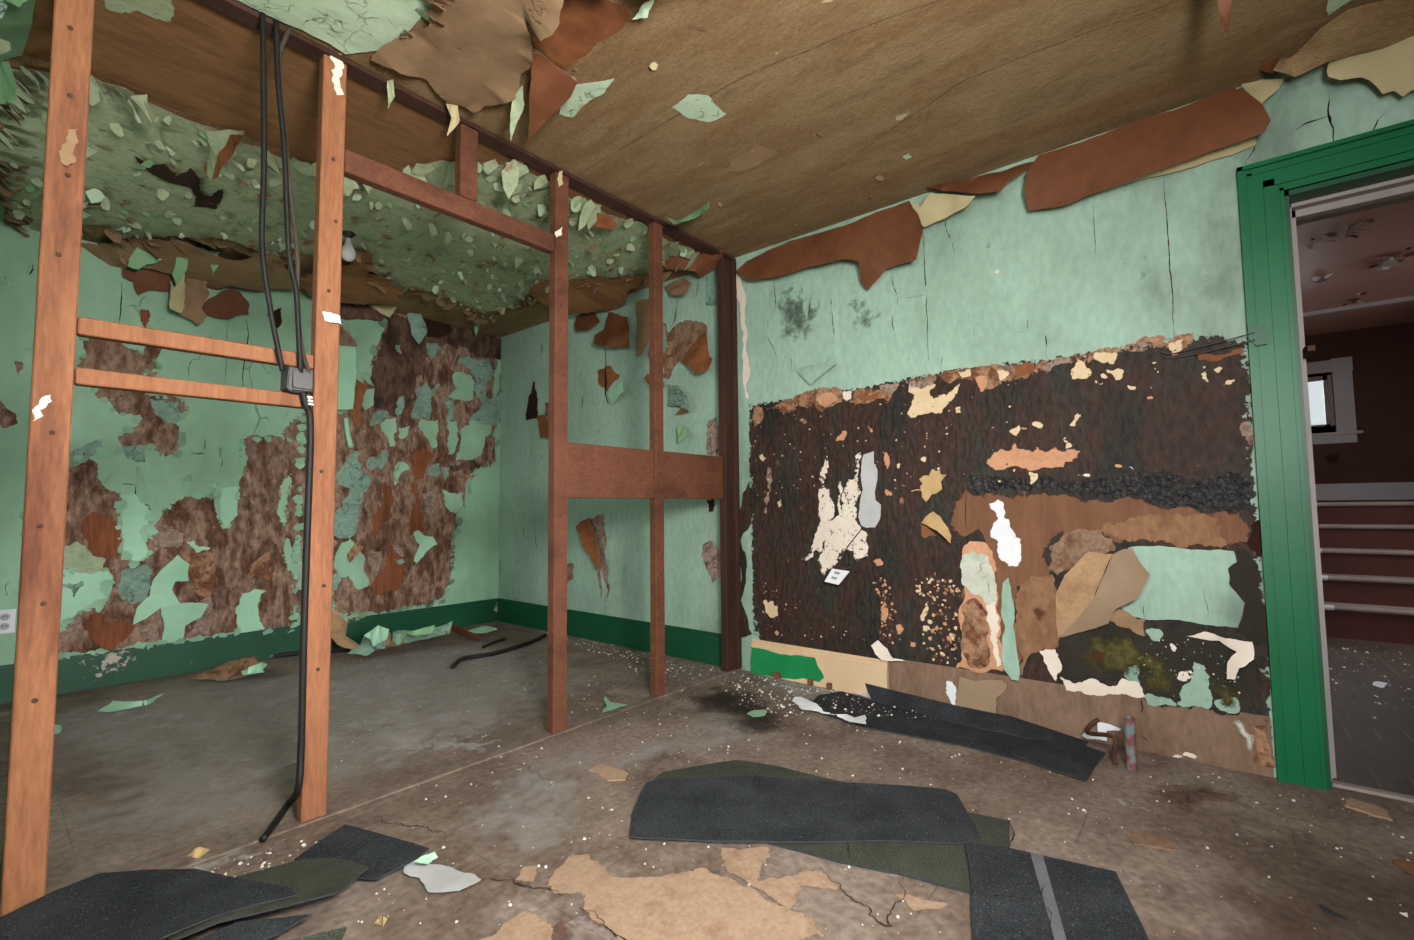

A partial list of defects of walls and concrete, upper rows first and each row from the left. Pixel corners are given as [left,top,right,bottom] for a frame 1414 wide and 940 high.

peeling [0,38,49,238]
peeling [82,75,316,328]
peeling [476,158,550,232]
peeling [568,196,717,442]
peeling [58,337,307,659]
peeling [331,177,550,649]
peeling [858,451,881,528]
peeling [921,511,951,543]
peeling [987,444,1080,471]
peeling [1055,548,1150,638]
peeling [871,640,907,662]
peeling [1188,632,1254,680]